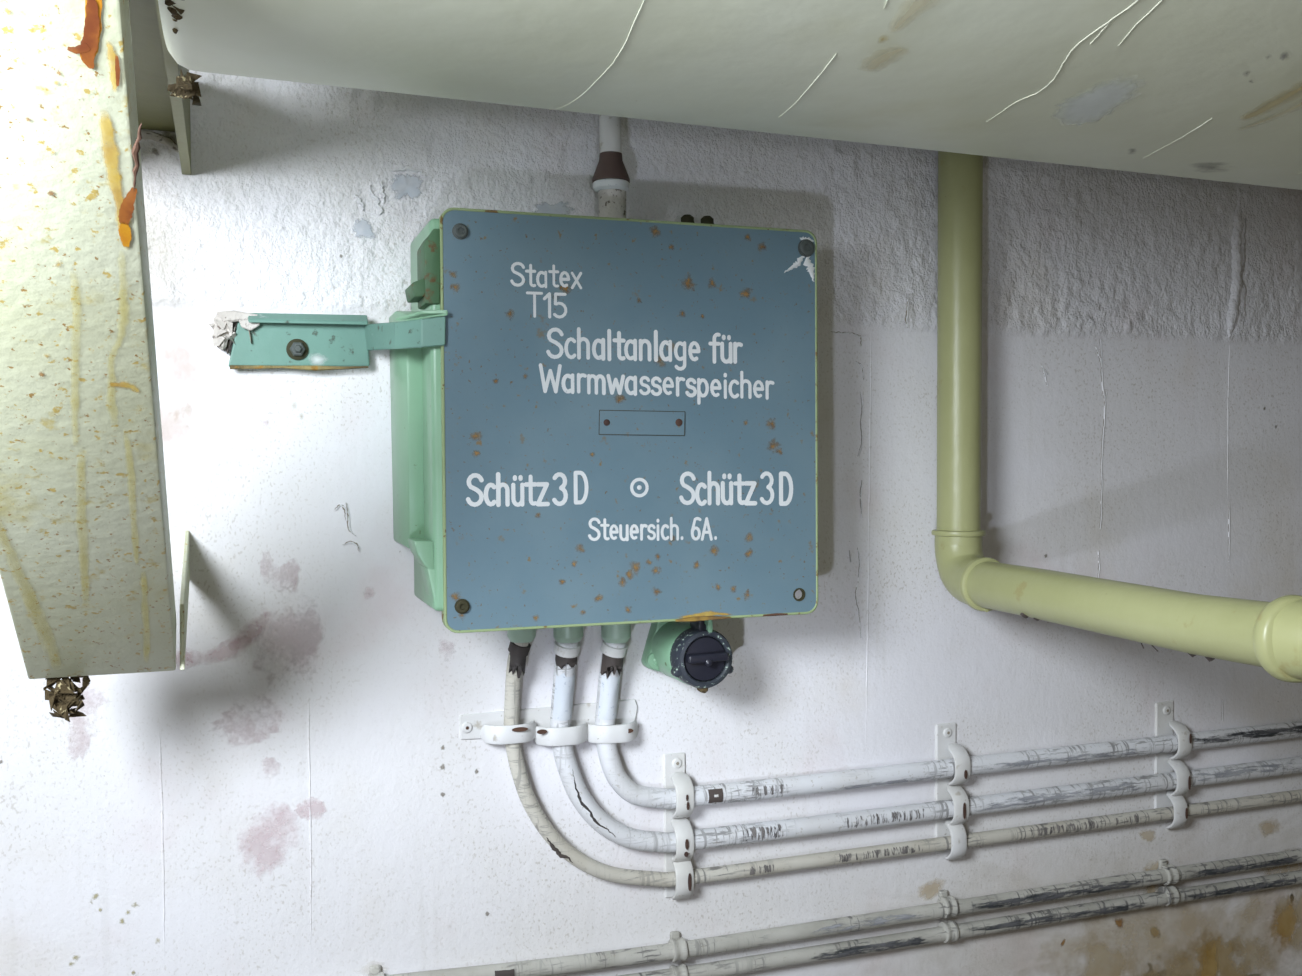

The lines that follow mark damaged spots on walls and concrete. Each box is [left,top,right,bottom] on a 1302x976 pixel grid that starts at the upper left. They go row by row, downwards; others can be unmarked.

crack [986,0,1162,122]
damp [972,881,1144,931]
damp [1166,937,1263,976]